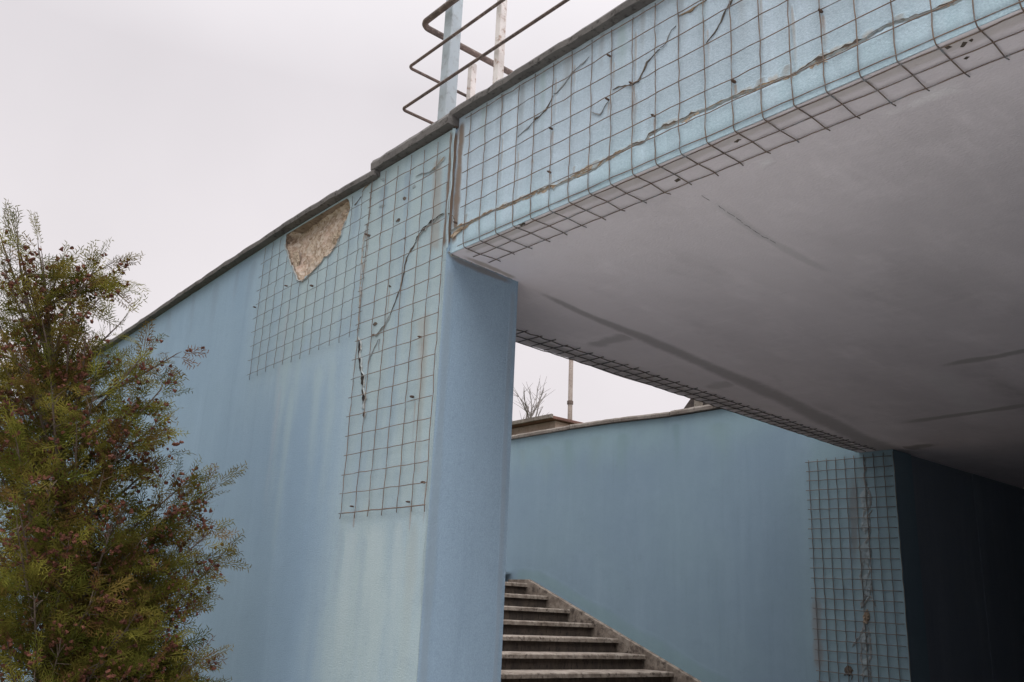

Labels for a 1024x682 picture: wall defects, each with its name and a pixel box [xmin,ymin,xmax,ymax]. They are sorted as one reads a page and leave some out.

spalling [248,0,1024,519]
crack [355,0,962,418]
crack [852,458,876,682]